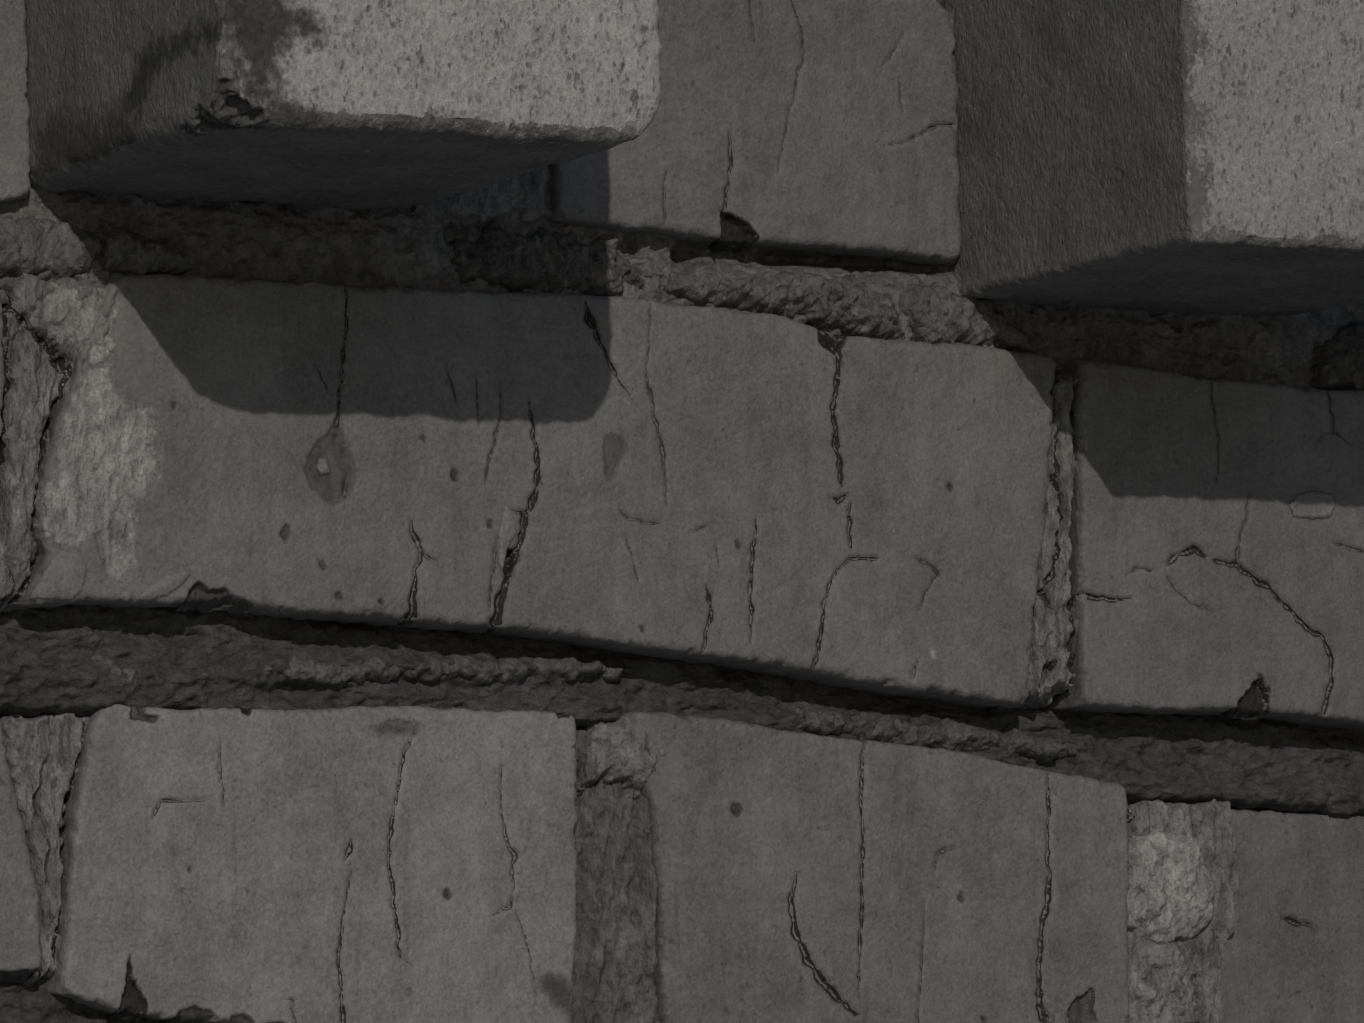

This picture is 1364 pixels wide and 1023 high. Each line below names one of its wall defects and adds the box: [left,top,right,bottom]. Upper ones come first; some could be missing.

crack [778,0,805,171]
crack [0,289,72,608]
crack [315,282,349,437]
crack [447,366,541,633]
crack [811,337,878,668]
crack [1033,379,1334,717]
crack [337,839,353,1023]
crack [387,733,415,966]
crack [492,768,535,980]
crack [788,742,866,1017]
crack [1035,775,1052,1023]
peeling [1067,988,1097,1023]